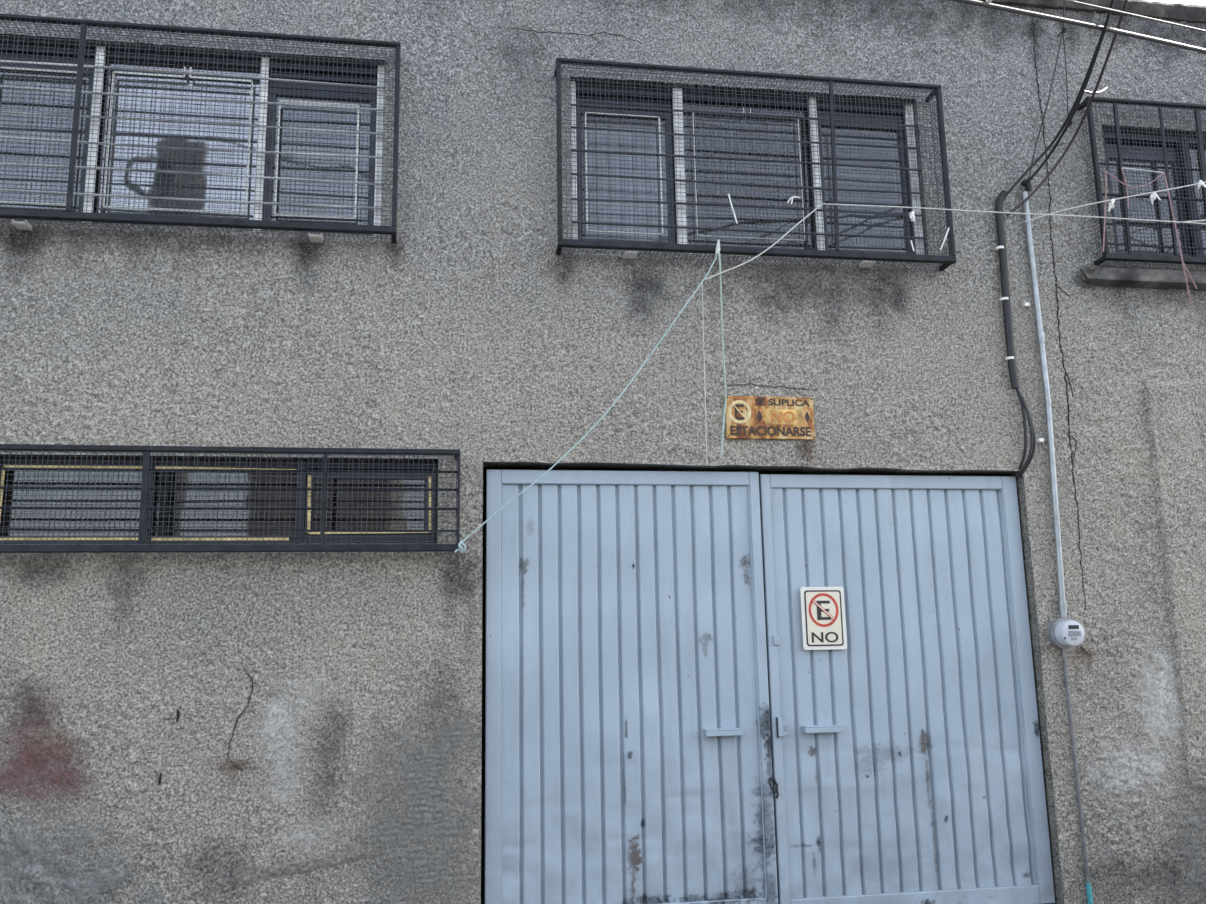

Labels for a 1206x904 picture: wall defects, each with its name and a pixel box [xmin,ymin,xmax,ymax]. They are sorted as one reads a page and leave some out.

crack [502,26,641,46]
crack [1032,9,1086,611]
crack [226,665,261,770]
rust [630,837,642,892]